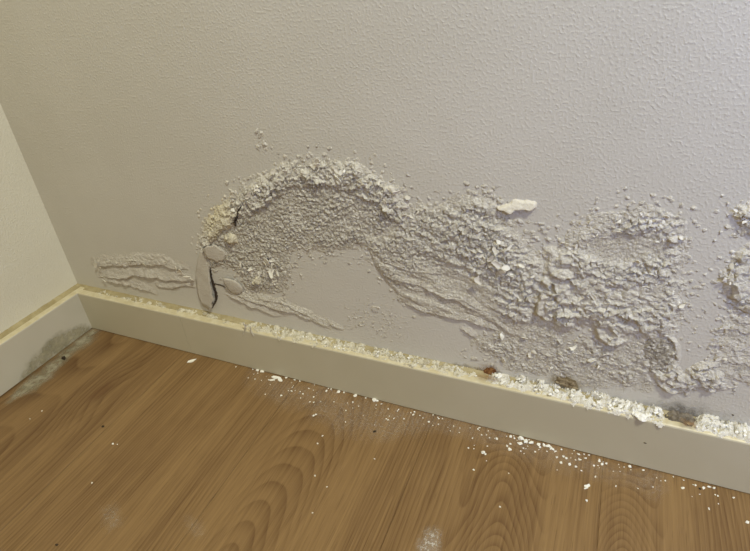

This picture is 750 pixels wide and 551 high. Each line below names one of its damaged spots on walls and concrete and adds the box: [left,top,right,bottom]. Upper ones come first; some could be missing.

peeling [183,248,214,310]
crack [210,262,225,308]
spalling [459,186,750,396]
mould [14,328,94,397]